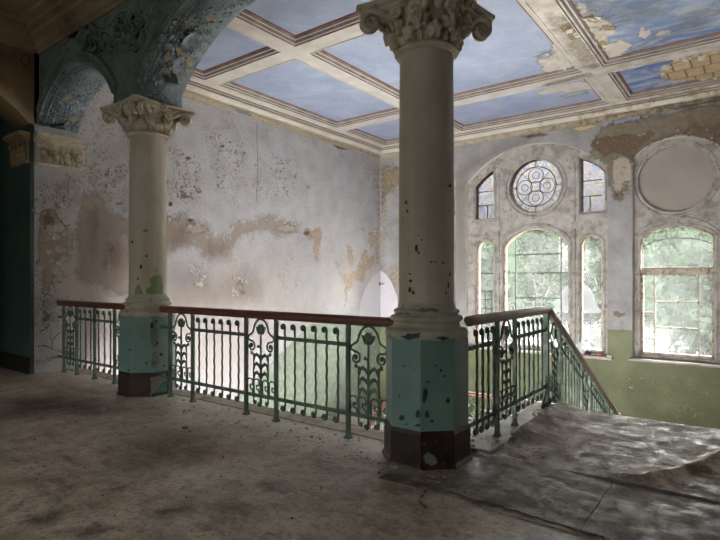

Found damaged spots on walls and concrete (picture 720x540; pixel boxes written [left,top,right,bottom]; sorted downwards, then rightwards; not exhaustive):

peeling [538,0,720,97]
flaking render [572,98,720,199]
flaking render [31,165,163,298]
flaking render [166,148,297,287]
peeling [399,381,434,427]